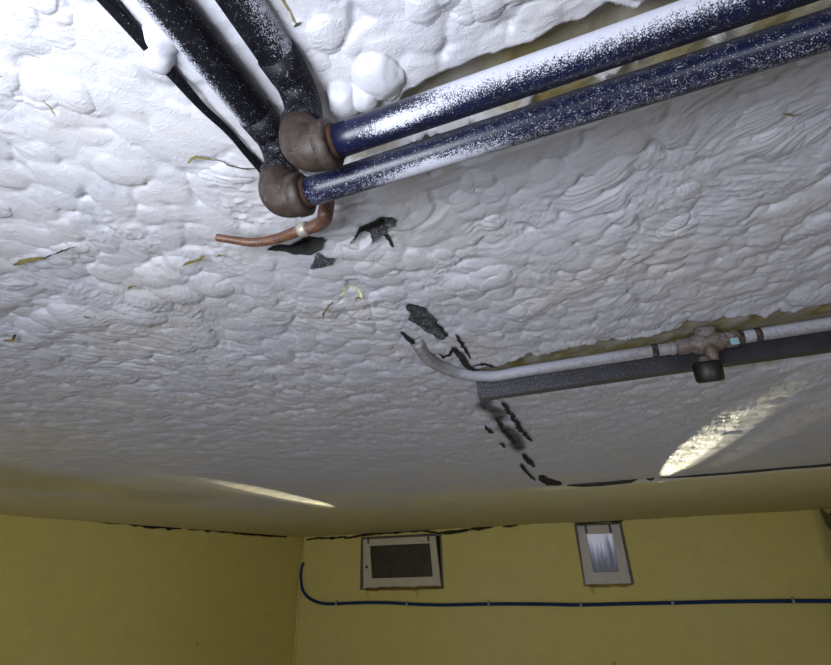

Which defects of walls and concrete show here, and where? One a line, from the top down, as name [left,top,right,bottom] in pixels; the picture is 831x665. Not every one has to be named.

peeling [310,253,335,269]
crack [479,401,831,487]